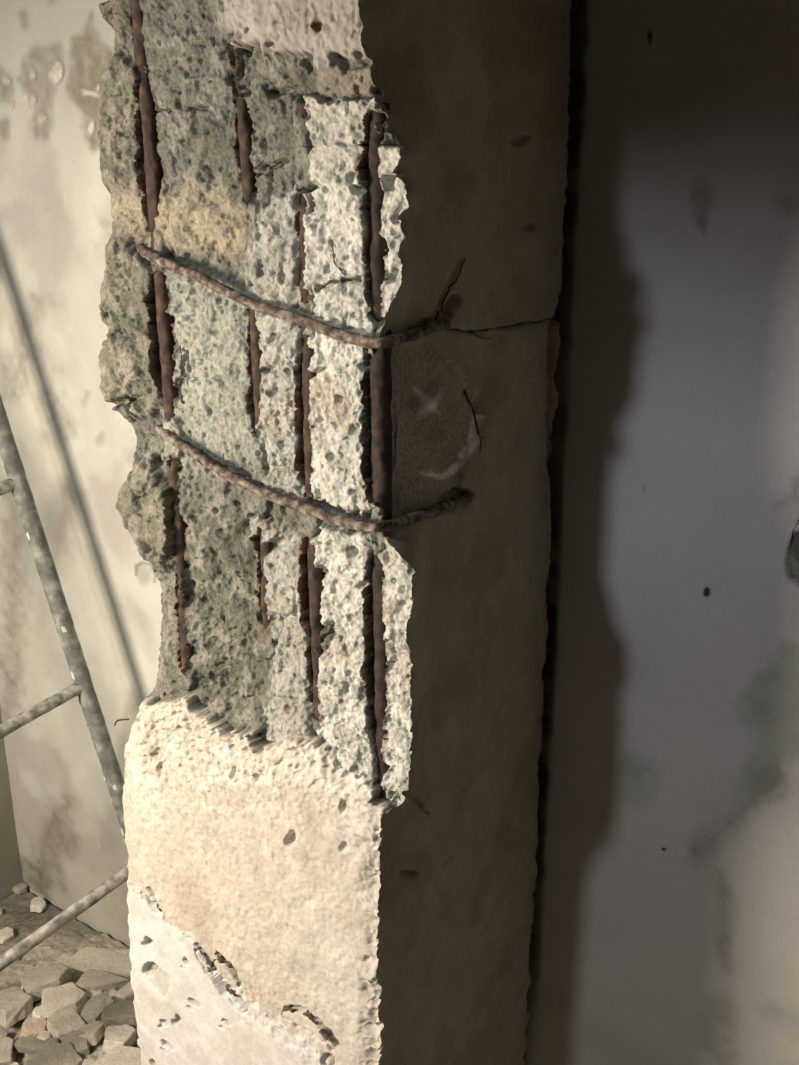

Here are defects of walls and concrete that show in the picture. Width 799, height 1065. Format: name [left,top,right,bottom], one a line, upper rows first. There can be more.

corrosion [126,0,167,232]
corrosion [227,38,259,205]
corrosion [357,107,392,322]
corrosion [142,271,180,422]
corrosion [244,308,264,440]
corrosion [293,335,322,502]
corrosion [359,353,373,503]
corrosion [161,481,188,563]
corrosion [248,527,271,628]
spalling [73,0,479,1065]
corrosion [296,536,329,724]
corrosion [360,557,392,807]